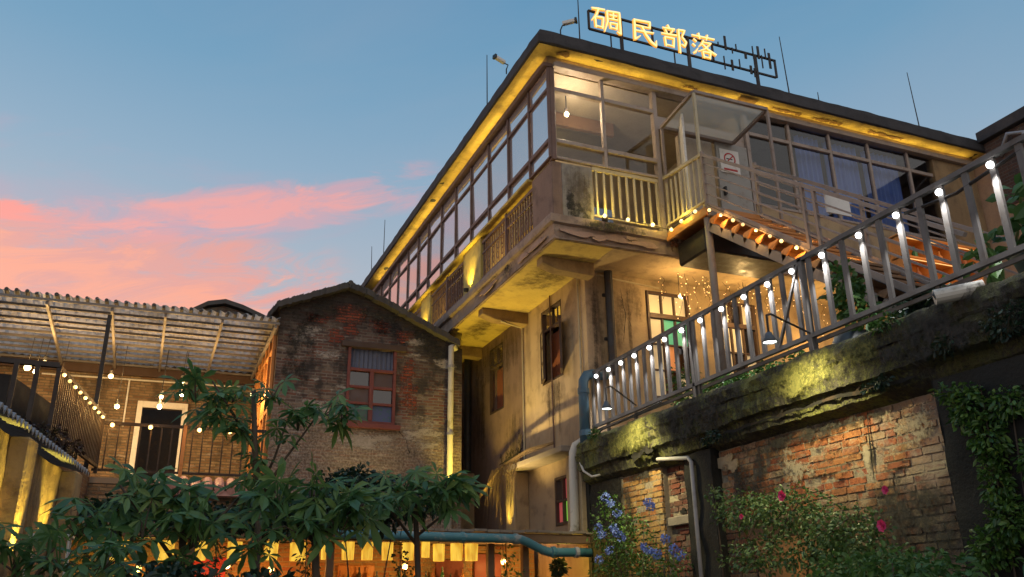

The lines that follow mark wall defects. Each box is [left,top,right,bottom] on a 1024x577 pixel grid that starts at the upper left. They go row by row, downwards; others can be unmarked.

damp [567,173,646,235]
damp [779,368,812,396]
damp [610,418,644,455]
crack [715,360,919,477]
flaking render [717,453,739,473]